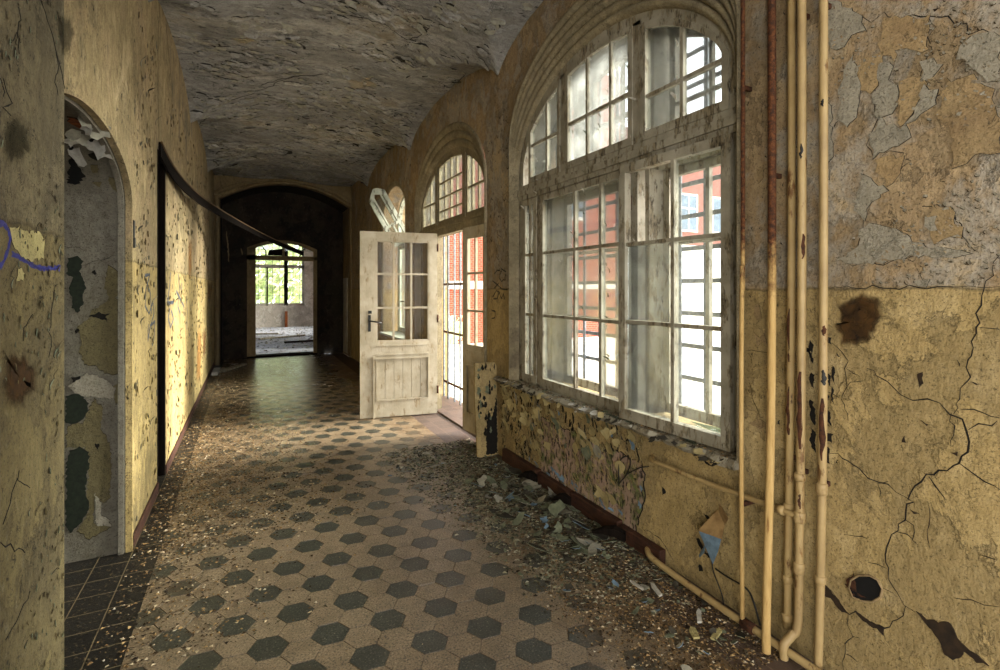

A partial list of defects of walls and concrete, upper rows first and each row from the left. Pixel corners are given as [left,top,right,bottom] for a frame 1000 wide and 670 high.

peeling [796,0,1000,288]
peeling [0,0,533,648]
damp [835,295,881,344]
peeling [418,362,646,592]
peeling [696,504,729,571]
peeling [778,326,842,465]
spalling [825,574,884,636]
crack [829,204,1000,670]
flaking render [916,611,989,666]